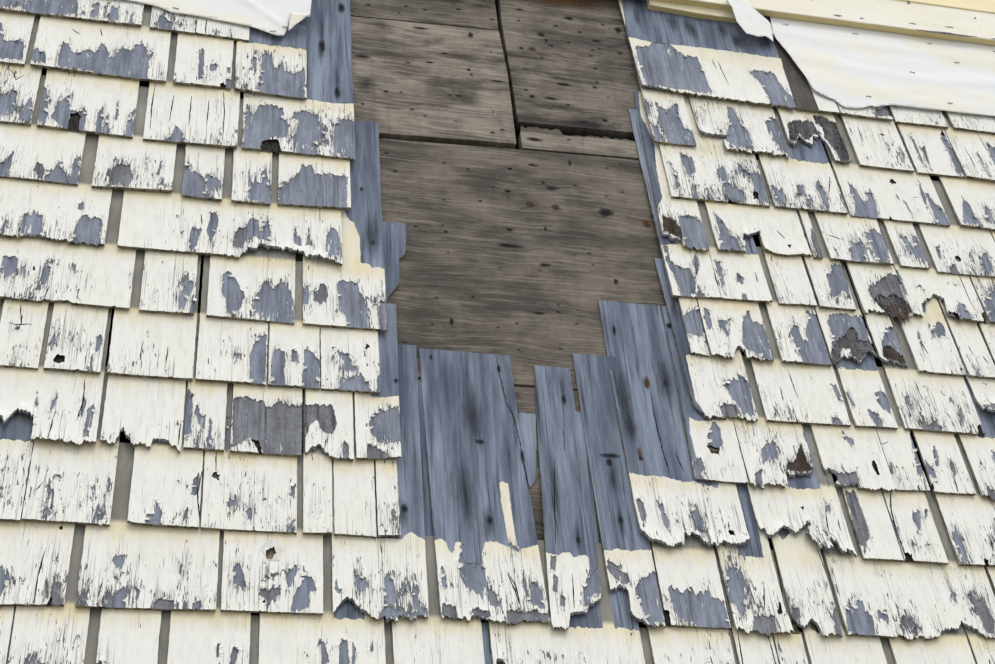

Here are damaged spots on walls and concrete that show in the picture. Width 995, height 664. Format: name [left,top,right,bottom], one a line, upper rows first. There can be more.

peeling [0,22,155,87]
peeling [198,48,356,208]
peeling [636,42,759,200]
peeling [179,210,219,314]
peeling [221,271,310,323]
peeling [241,218,342,263]
peeling [335,279,387,330]
peeling [662,214,774,360]
crack [496,357,529,489]
crack [554,402,565,542]
crack [508,573,521,607]
peeling [569,564,751,636]